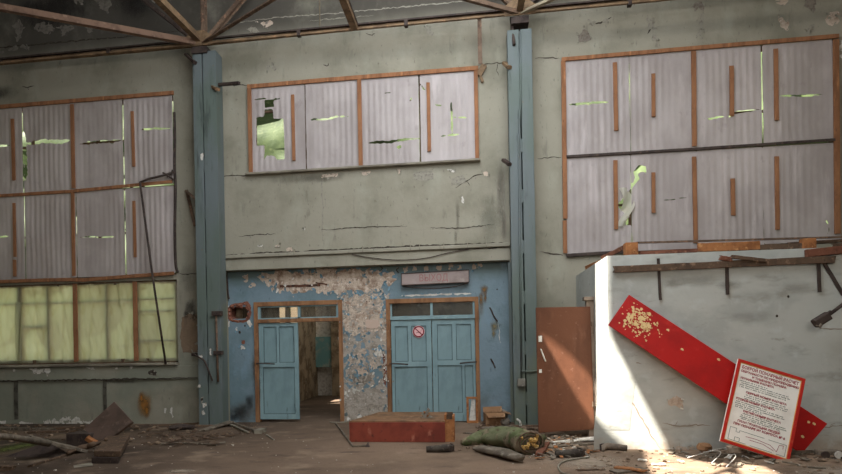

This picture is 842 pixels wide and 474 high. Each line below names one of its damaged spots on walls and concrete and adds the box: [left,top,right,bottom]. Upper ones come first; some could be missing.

crack [231,224,508,273]
peeling [178,311,212,358]
peeling [242,263,483,421]
peeling [43,416,93,424]